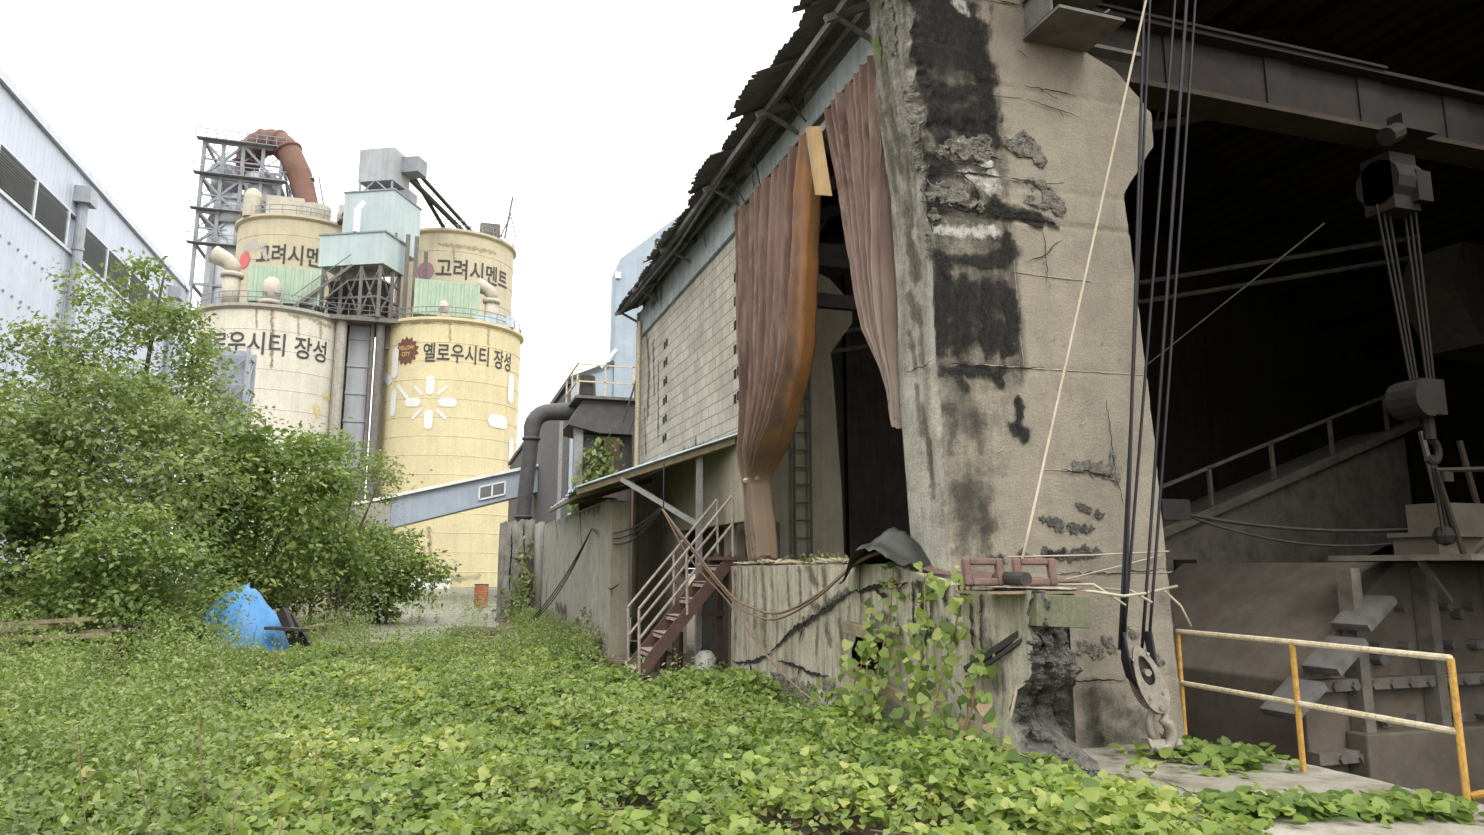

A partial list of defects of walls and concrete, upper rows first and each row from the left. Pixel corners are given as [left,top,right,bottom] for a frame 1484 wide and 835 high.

leakage [869,0,1059,498]
spalling [901,78,1067,261]
leakage [958,481,1065,565]